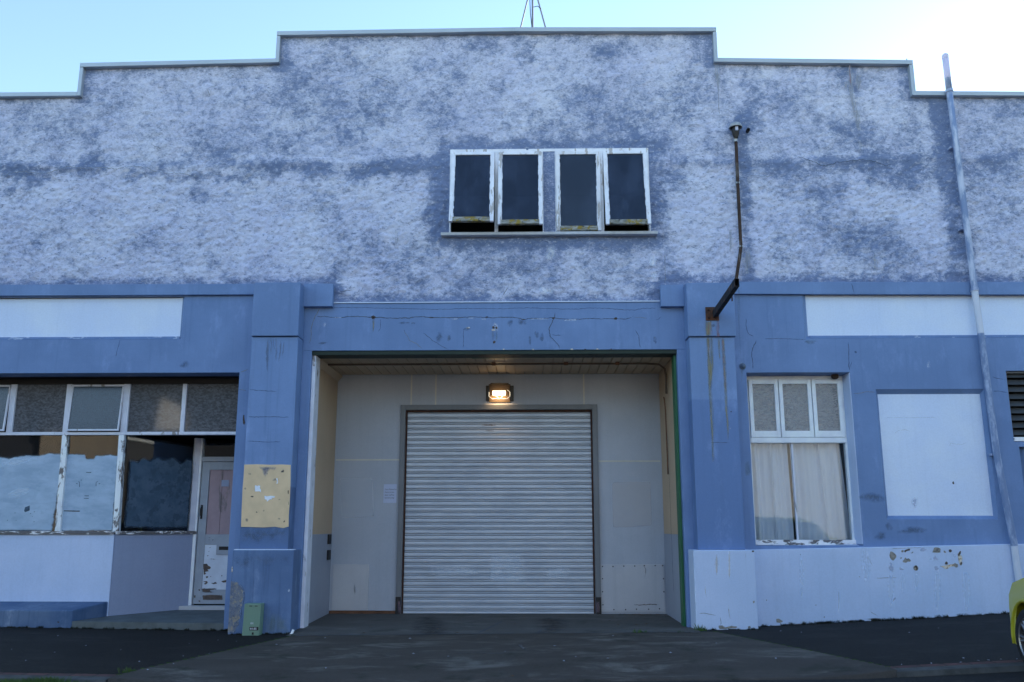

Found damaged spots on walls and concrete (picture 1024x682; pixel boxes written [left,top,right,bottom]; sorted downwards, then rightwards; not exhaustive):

crack [310,289,651,348]
corrosion [706,322,729,445]
spalling [890,549,918,571]
spalling [933,547,962,569]
spalling [194,551,245,633]